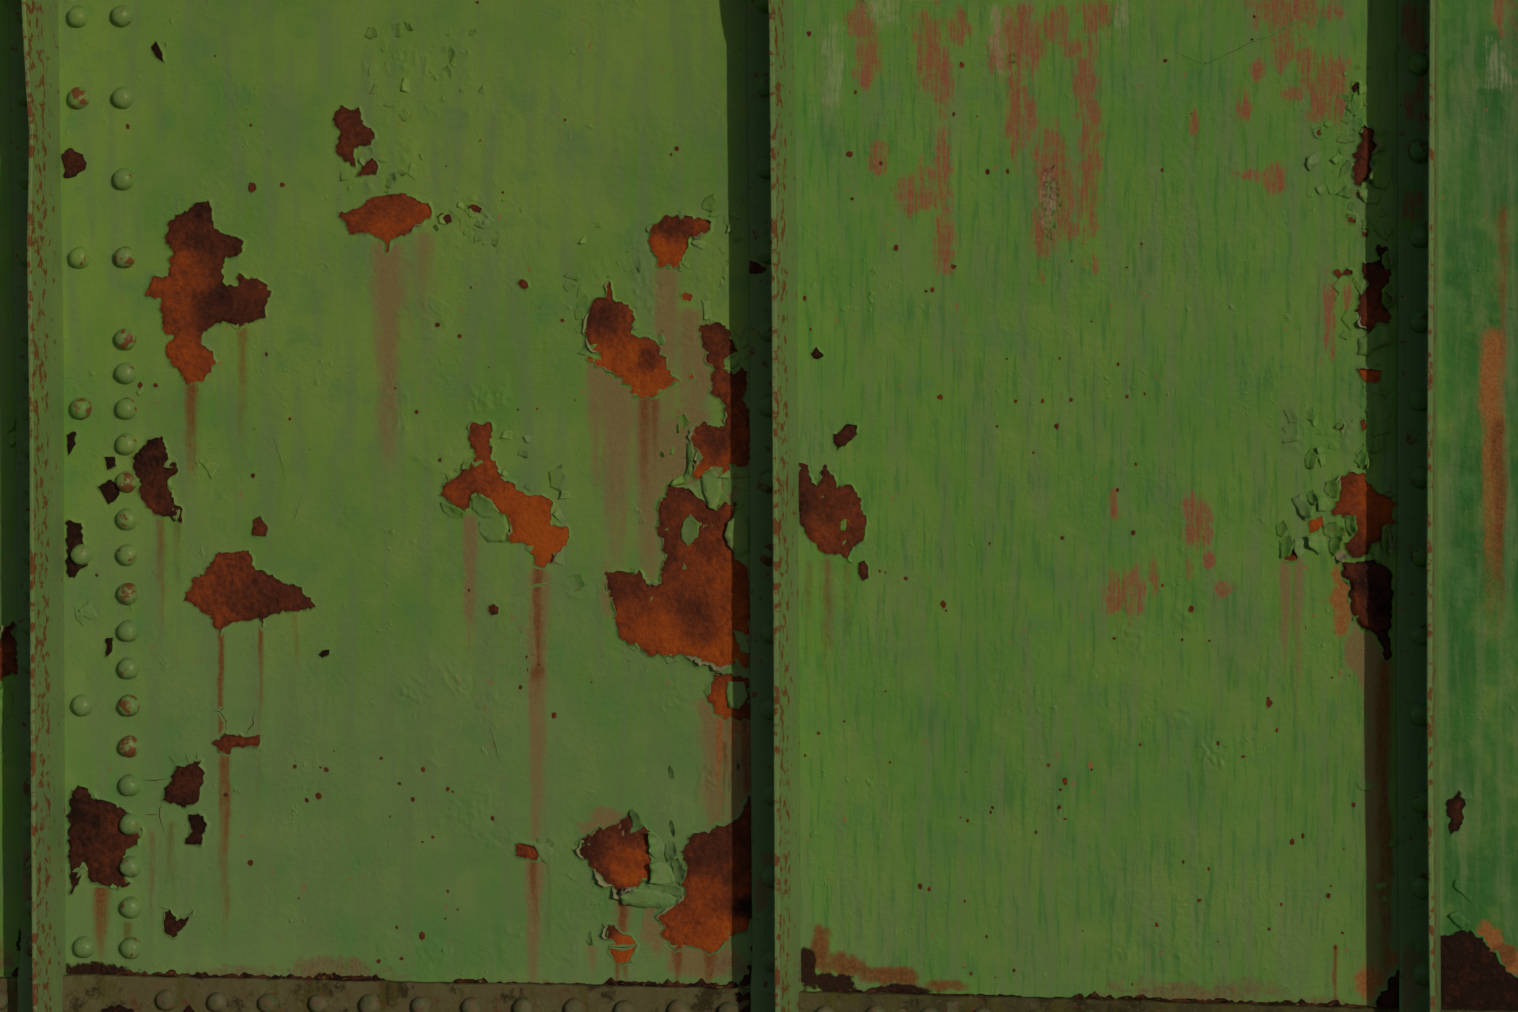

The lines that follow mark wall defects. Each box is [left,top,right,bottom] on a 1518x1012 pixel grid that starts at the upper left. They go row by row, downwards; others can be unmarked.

corrosion [142,196,275,387]
peeling [333,131,532,255]
corrosion [644,193,723,272]
corrosion [1305,64,1397,386]
corrosion [0,617,18,728]
corrosion [64,279,752,1012]
corrosion [0,746,10,858]
corrosion [0,915,21,977]